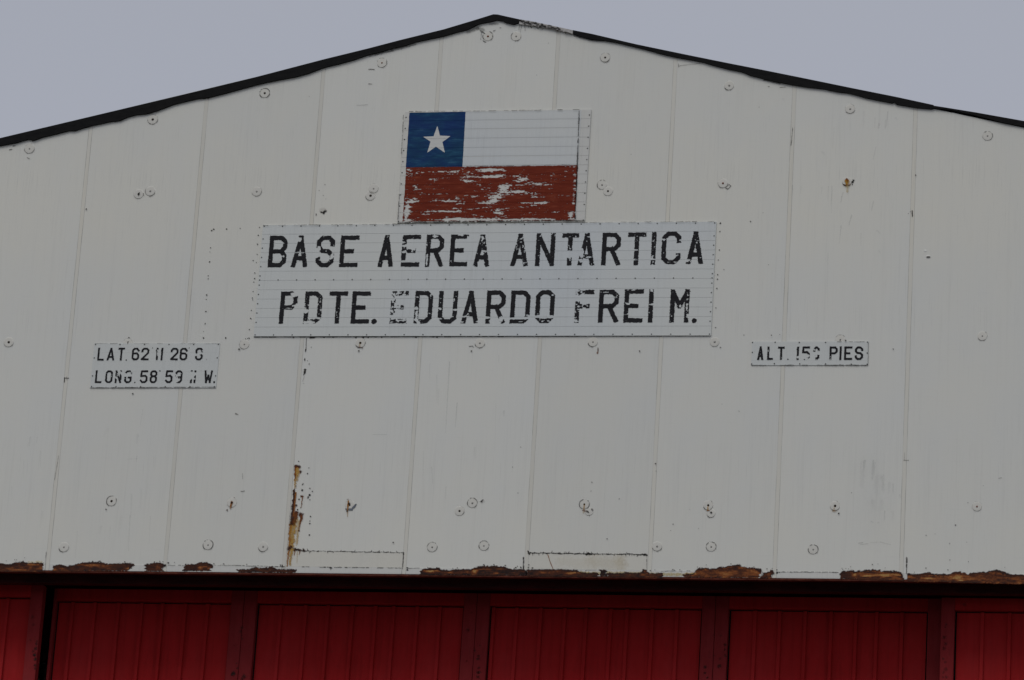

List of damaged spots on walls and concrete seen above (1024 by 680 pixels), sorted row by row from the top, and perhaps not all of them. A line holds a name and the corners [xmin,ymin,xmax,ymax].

rust [0,465,1024,584]